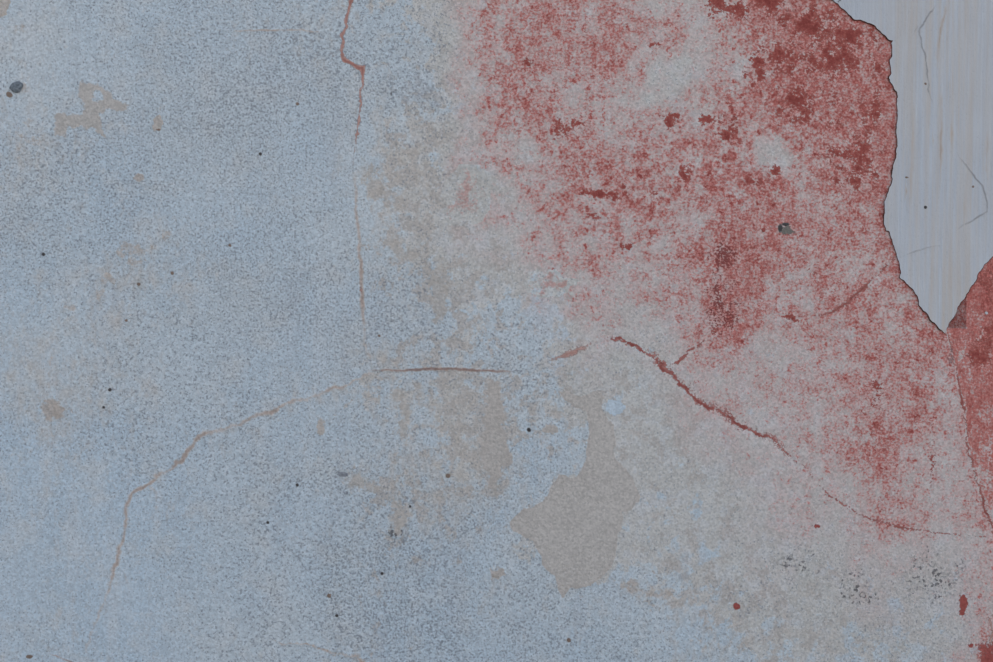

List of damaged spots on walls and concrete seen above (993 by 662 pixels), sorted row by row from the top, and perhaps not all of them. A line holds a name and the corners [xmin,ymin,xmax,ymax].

crack [43,0,521,662]
peeling [436,0,993,662]
crack [552,333,993,537]